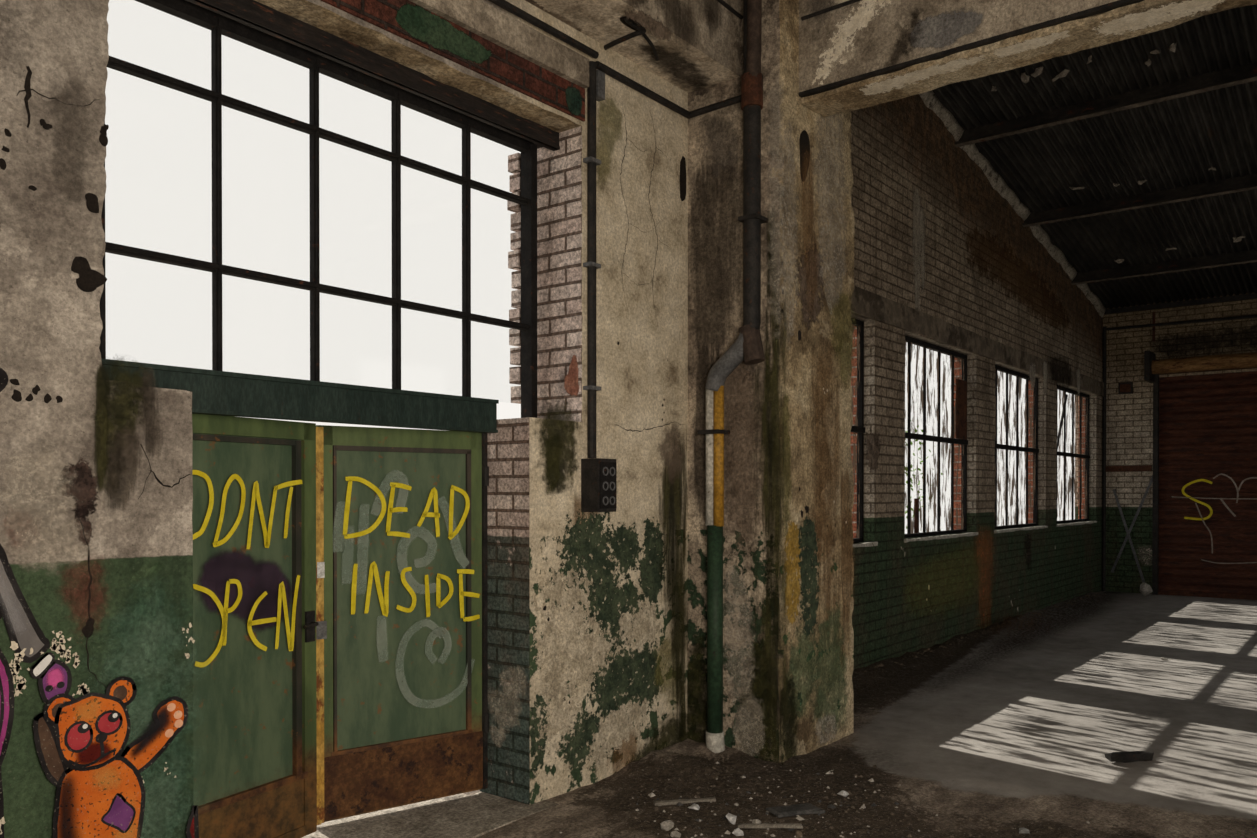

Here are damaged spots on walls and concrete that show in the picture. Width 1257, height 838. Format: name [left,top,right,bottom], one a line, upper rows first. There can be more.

crack [17,66,95,128]
peeling [812,0,892,85]
peeling [859,30,1070,96]
peeling [1092,0,1225,36]
water stain [659,118,739,739]
water stain [724,362,757,544]
flaking render [529,509,666,778]